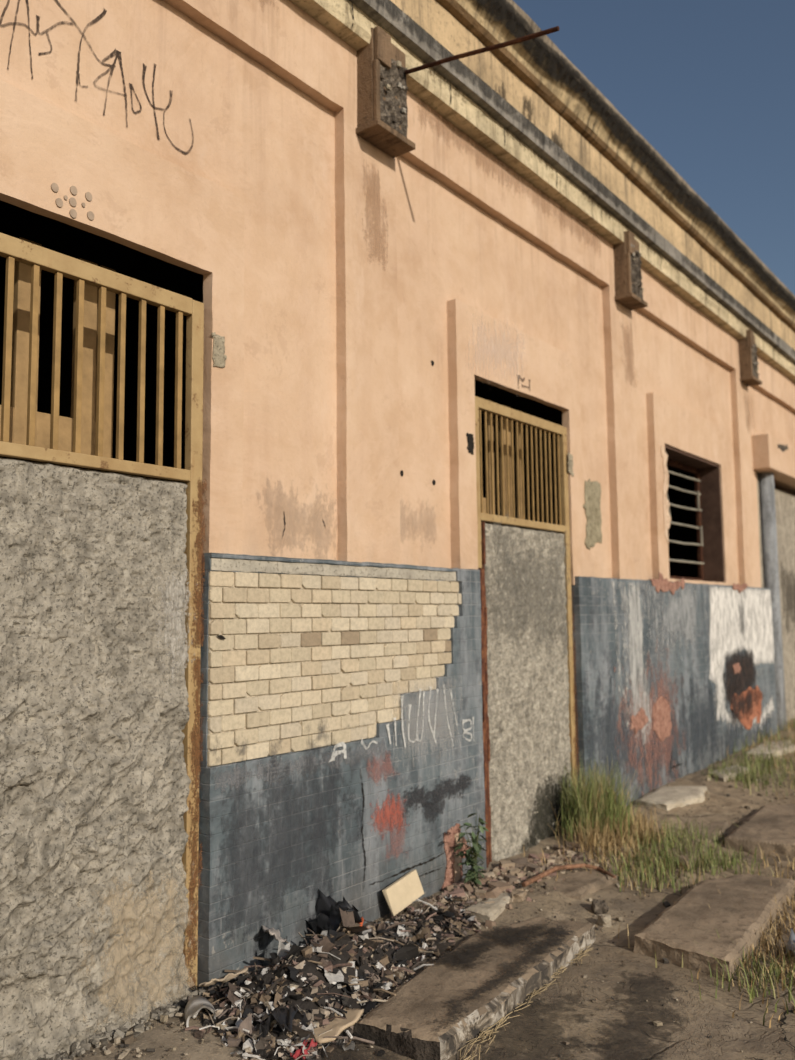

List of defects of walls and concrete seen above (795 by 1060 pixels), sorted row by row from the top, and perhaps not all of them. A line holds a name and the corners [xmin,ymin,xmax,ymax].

damp [376,0,651,232]
damp [476,0,795,311]
damp [648,245,774,337]
spalling [651,572,685,595]
spalling [630,695,672,742]
spalling [731,685,763,730]